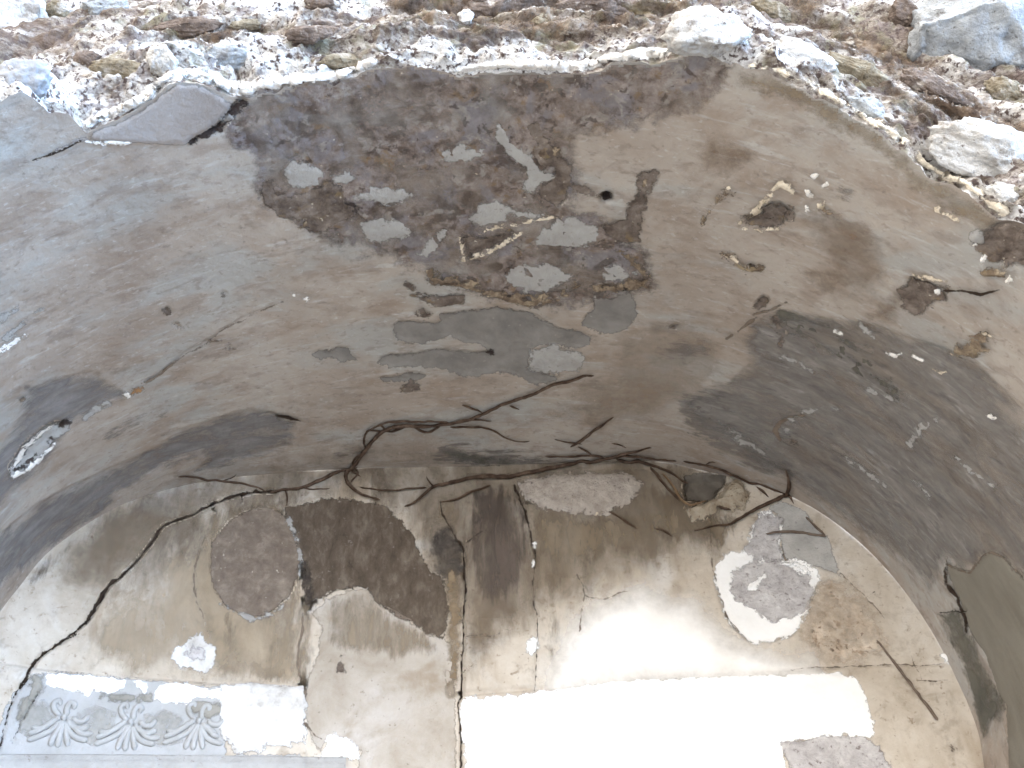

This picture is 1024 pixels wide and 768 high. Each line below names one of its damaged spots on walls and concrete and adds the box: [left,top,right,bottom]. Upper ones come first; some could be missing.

spalling [32,56,727,392]
spalling [738,173,850,233]
spalling [896,223,1024,315]
flaking render [0,378,122,501]
crack [0,489,273,747]
flaking render [171,632,216,673]
spalling [211,497,449,639]
crack [440,502,488,768]
damp [472,489,525,602]
peeling [518,470,644,517]
damp [680,400,781,473]
flaking render [683,297,1024,768]